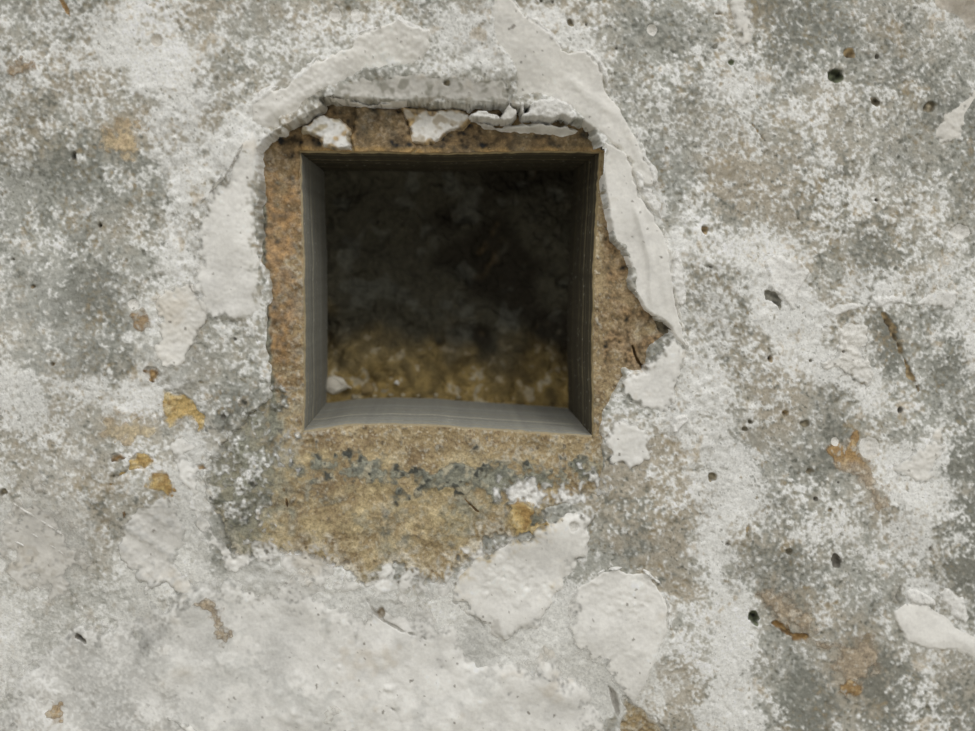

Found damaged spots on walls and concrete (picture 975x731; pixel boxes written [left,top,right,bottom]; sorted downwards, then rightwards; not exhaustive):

crack [60,0,71,17]
spalling [197,0,689,618]
spalling [143,367,210,432]